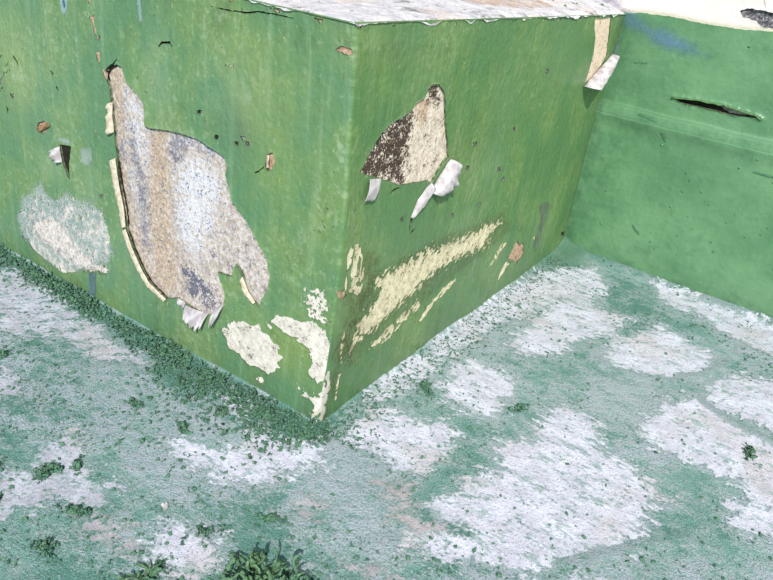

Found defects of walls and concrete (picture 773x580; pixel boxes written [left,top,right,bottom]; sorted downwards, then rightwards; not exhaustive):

peeling [584,17,620,90]
flaking render [741,8,773,28]
peeling [49,145,71,176]
peeling [17,181,114,273]
peeling [96,51,270,333]
peeling [257,153,275,172]
peeling [360,84,469,221]
peeling [0,263,160,374]
peeling [155,217,773,580]
peeling [0,421,240,580]